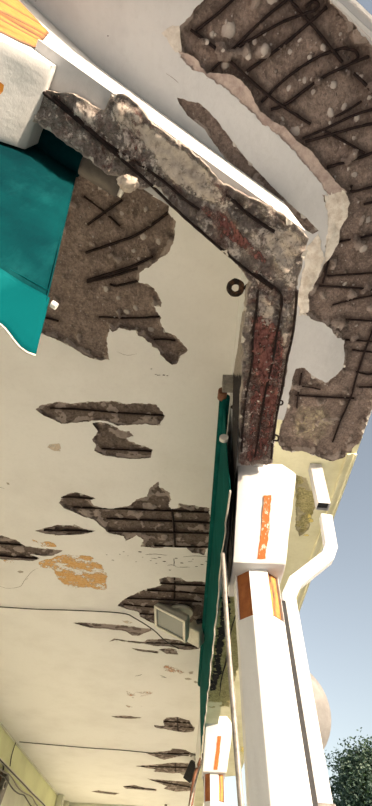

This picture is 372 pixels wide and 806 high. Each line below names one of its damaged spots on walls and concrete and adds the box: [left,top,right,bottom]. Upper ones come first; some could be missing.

spalling [32,0,372,466]
corrosion [202,208,266,263]
corrosion [247,316,284,462]
spalling [0,482,210,590]
spalling [75,577,205,654]
spalling [154,717,195,732]
spalling [92,749,193,795]